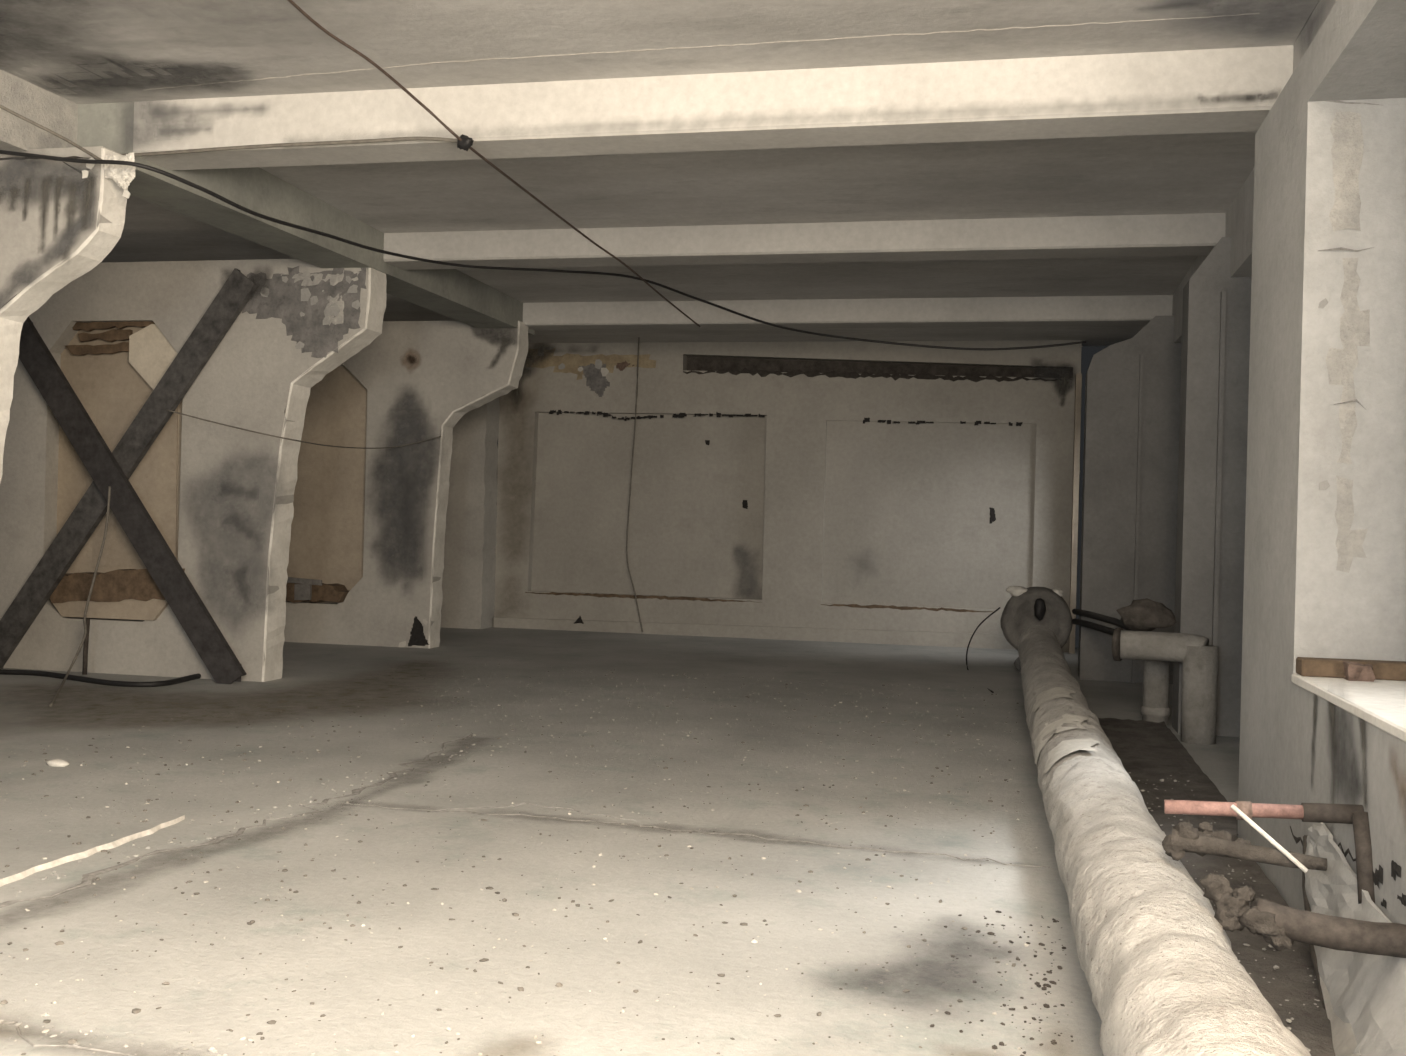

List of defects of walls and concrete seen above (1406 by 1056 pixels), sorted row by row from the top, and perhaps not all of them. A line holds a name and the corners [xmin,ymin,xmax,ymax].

leakage [0,156,96,308]
leakage [374,394,435,577]
crack [0,733,1050,908]
crack [1,1021,134,1056]